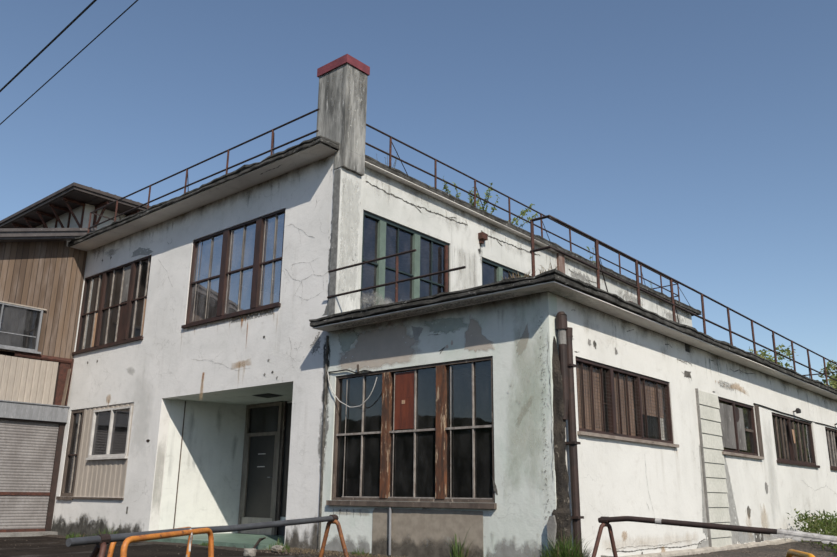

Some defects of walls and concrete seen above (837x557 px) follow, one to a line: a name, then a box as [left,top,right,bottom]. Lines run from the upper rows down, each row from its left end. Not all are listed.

crack [343,165,540,256]
peeling [339,314,493,369]
water stain [322,344,330,406]
water stain [51,516,141,537]